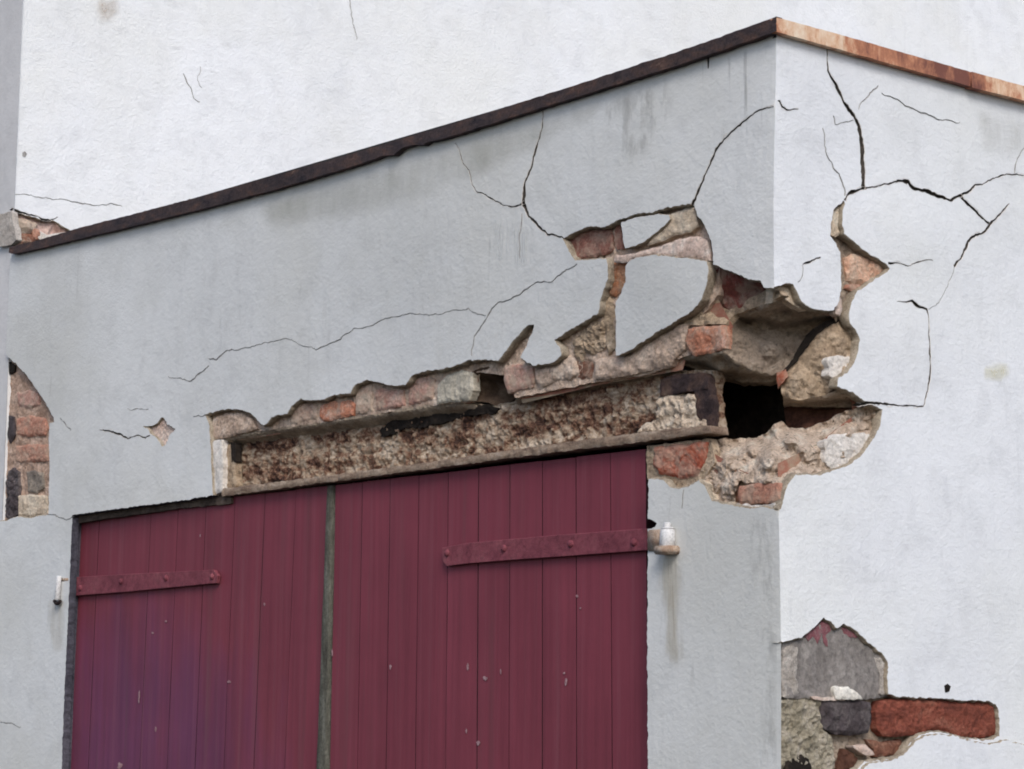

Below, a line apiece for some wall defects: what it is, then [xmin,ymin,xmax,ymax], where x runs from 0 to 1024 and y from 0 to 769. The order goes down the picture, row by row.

flaking render [0,211,67,247]
crack [10,194,121,221]
crack [455,111,564,257]
crack [691,100,796,205]
crack [822,49,1024,408]
crack [168,263,577,382]
flaking render [212,206,884,508]
flaking render [2,361,54,520]
crack [101,408,150,439]
flaking render [151,419,175,445]
flaking render [781,621,1024,769]